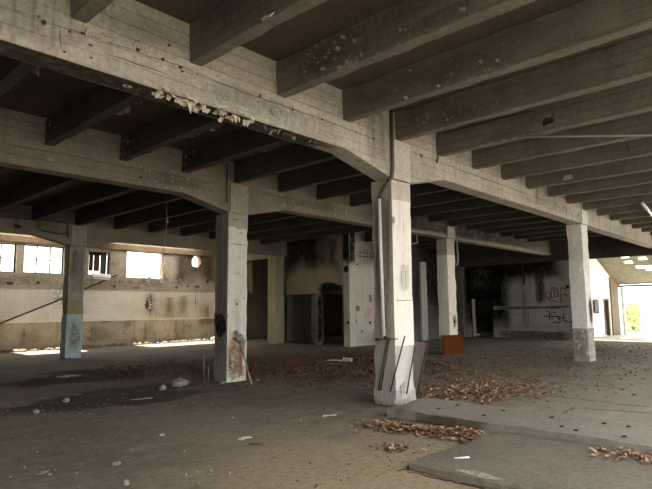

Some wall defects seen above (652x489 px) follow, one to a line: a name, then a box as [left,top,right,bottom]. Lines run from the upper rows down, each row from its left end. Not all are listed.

peeling [116,86,255,137]
damp [491,262,569,309]
corrosion [228,337,245,378]
damp [501,331,567,340]